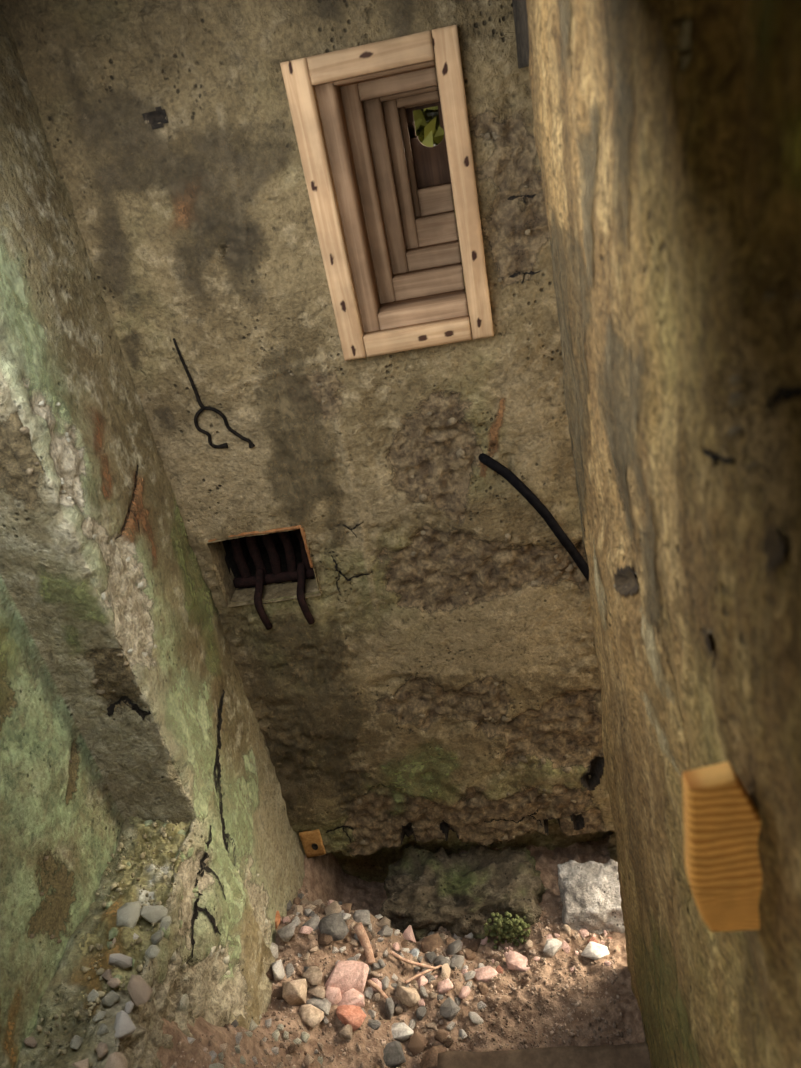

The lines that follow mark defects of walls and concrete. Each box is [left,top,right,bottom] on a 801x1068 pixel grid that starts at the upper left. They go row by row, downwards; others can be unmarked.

rust [92,410,112,499]
rust [123,476,157,568]
rust [208,525,314,568]
crack [107,696,151,720]
crack [186,689,237,964]